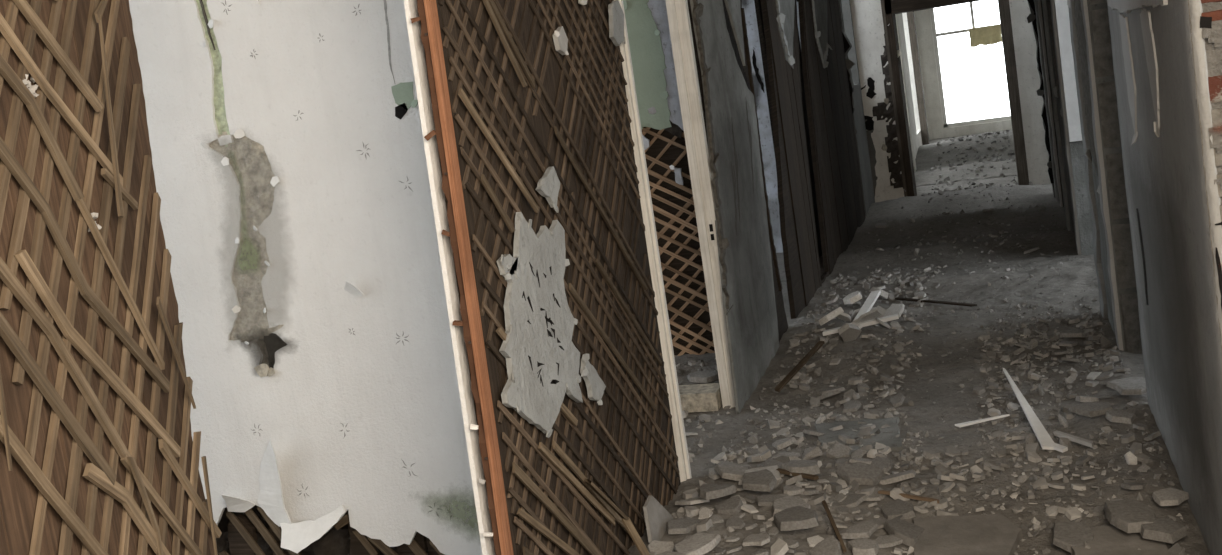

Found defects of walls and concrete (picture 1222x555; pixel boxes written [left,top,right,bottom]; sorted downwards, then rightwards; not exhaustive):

crack [190,0,258,147]
flaking render [200,128,280,345]
spalling [391,0,501,555]
flaking render [497,166,606,438]
flaking render [553,26,569,55]
peeling [608,0,682,150]
flaking render [1027,0,1062,184]
flaking render [1067,0,1160,354]
flaking render [1188,0,1222,353]
flaking render [213,438,445,555]